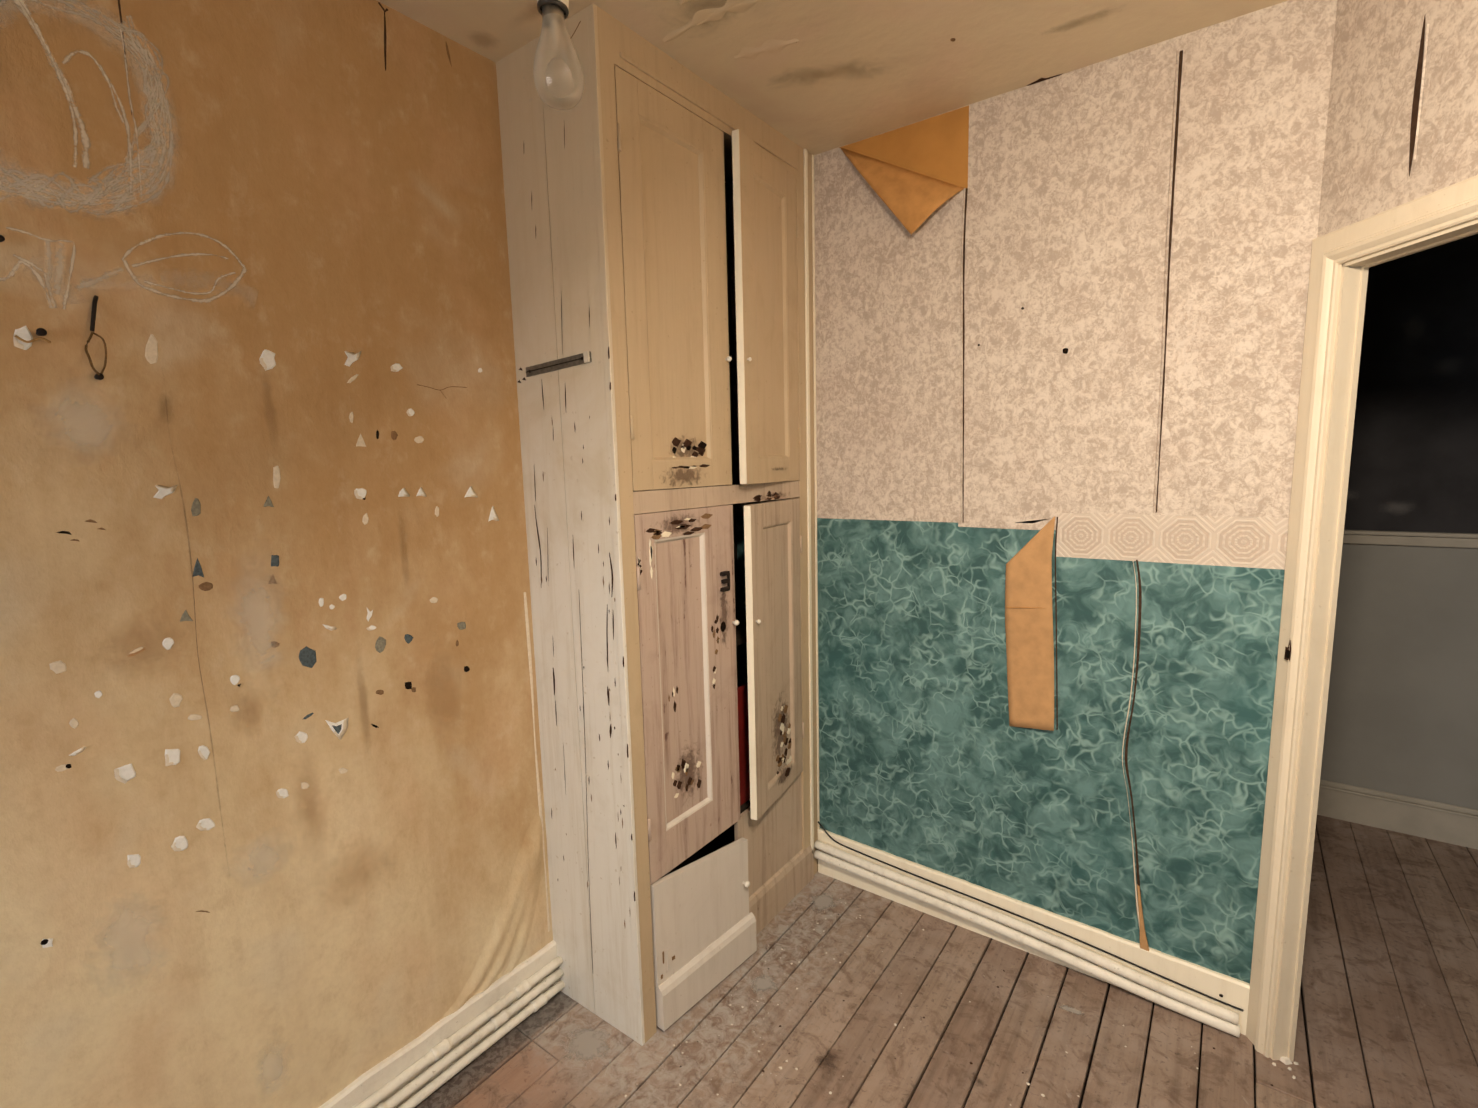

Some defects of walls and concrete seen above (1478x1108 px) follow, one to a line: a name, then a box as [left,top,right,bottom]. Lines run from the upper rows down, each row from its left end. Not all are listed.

peeling [839,105,969,188]
flaking render [13,326,33,350]
flaking render [259,349,276,371]
flaking render [354,488,369,525]
flaking render [465,486,499,522]
flaking render [162,637,174,650]
peeling [299,646,317,668]
peeling [366,608,386,653]
peeling [1005,516,1058,731]
flaking render [295,712,349,744]
flaking render [165,749,180,766]
flaking render [171,818,215,851]